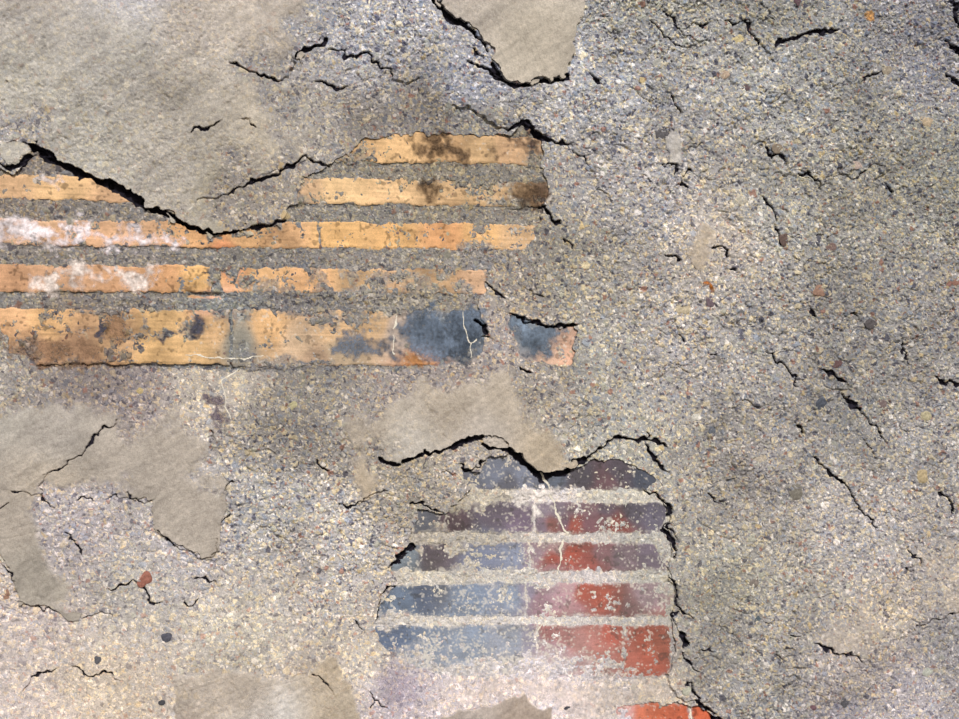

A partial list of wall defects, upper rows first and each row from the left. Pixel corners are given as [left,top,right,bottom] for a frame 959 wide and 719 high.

crack [230,62,280,82]
crack [328,49,393,77]
flaking render [431,0,575,89]
crack [0,145,37,171]
crack [223,156,330,195]
crack [502,119,588,165]
spalling [0,126,548,374]
crack [538,205,573,249]
spalling [508,314,577,367]
crack [0,425,111,509]
spalling [372,424,675,685]
spalling [616,701,711,719]